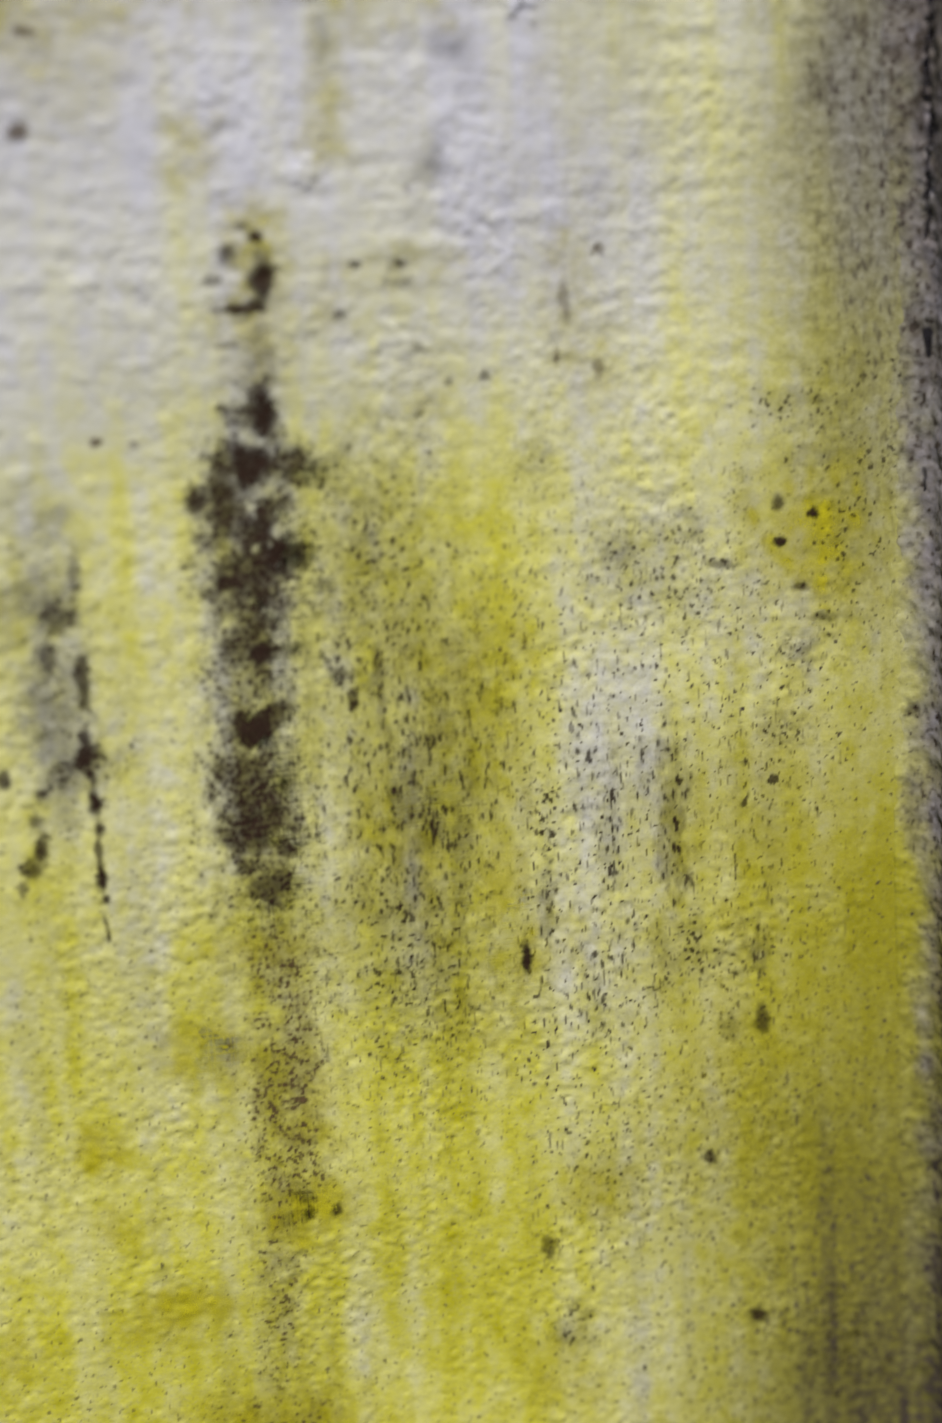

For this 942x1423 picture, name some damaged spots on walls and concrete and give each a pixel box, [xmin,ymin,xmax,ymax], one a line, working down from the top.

leakage [214,222,274,315]
leakage [38,570,80,672]
leakage [0,771,10,789]
leakage [37,656,109,903]
leakage [19,818,48,891]
leakage [181,374,501,1369]